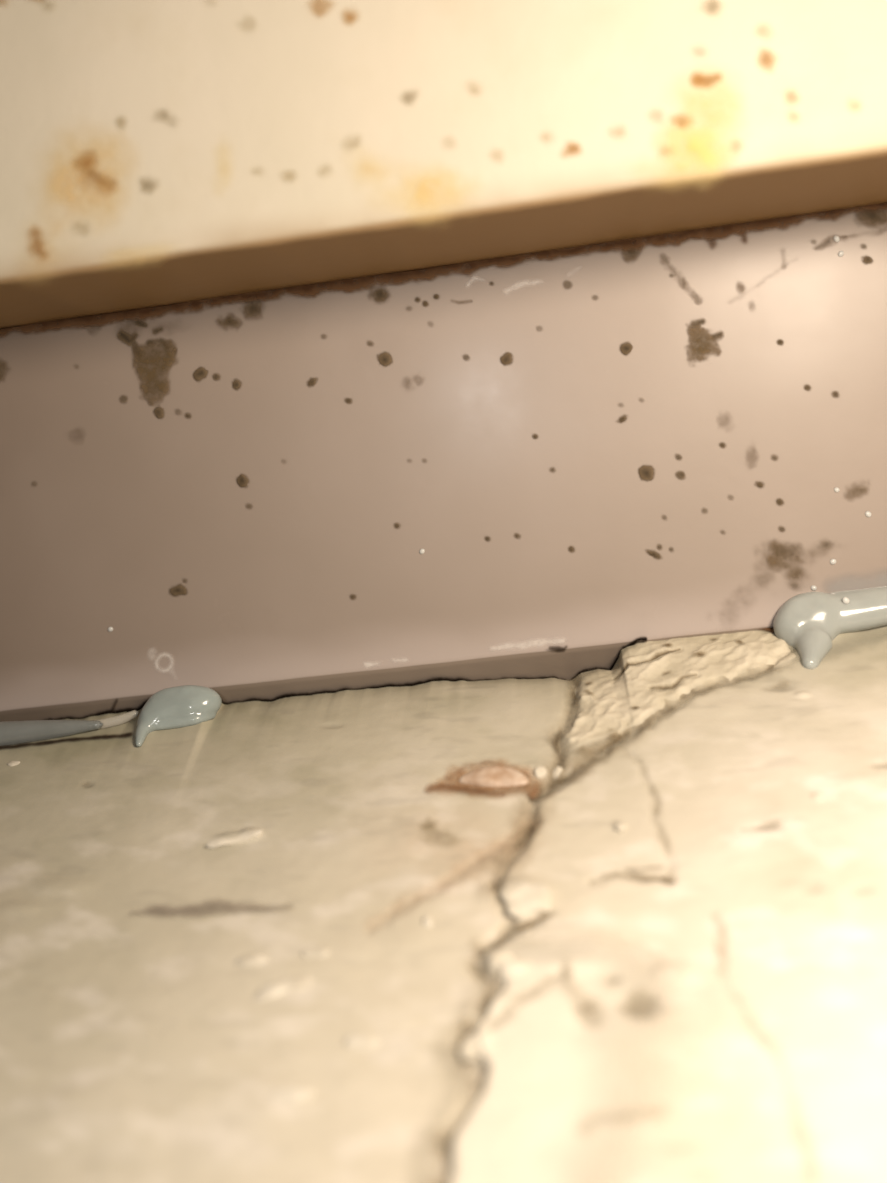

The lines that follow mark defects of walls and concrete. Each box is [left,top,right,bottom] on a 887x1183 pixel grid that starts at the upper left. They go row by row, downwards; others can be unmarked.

corrosion [692,74,721,87]
corrosion [65,154,113,193]
corrosion [0,203,887,336]
crack [222,637,647,705]
flaking render [561,630,798,750]
crack [0,700,148,749]
crack [551,719,651,786]
crack [634,875,674,883]
crack [483,912,552,951]